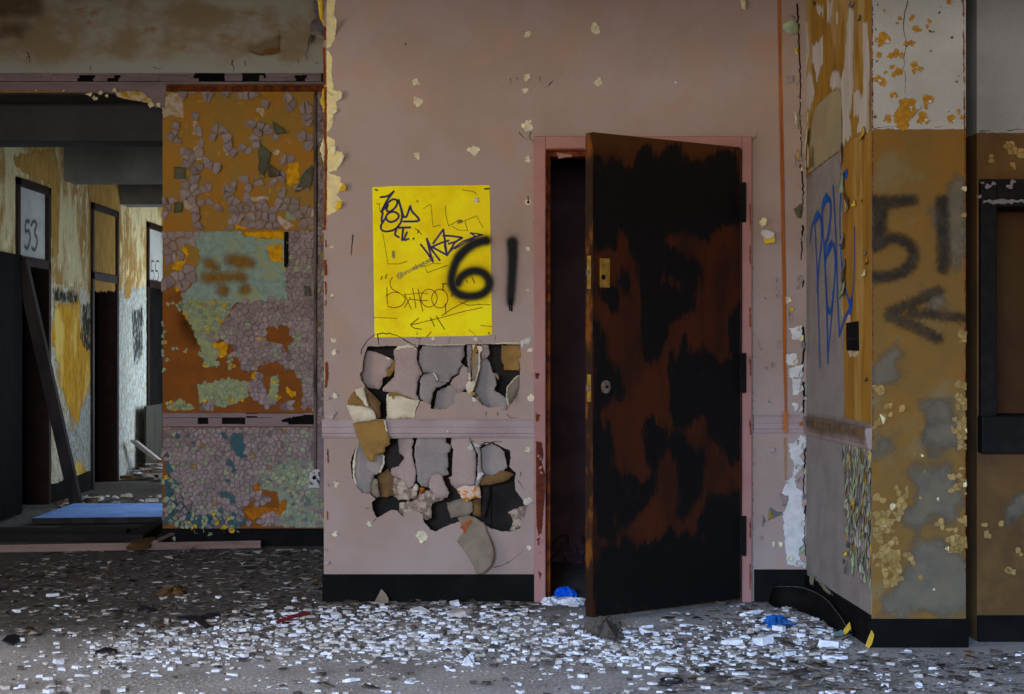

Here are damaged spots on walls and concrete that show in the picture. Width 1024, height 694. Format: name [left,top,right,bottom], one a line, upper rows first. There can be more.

peeling [51,0,347,541]
peeling [415,531,428,543]
peeling [752,207,833,597]
crack [796,3,804,288]
peeling [783,0,967,619]